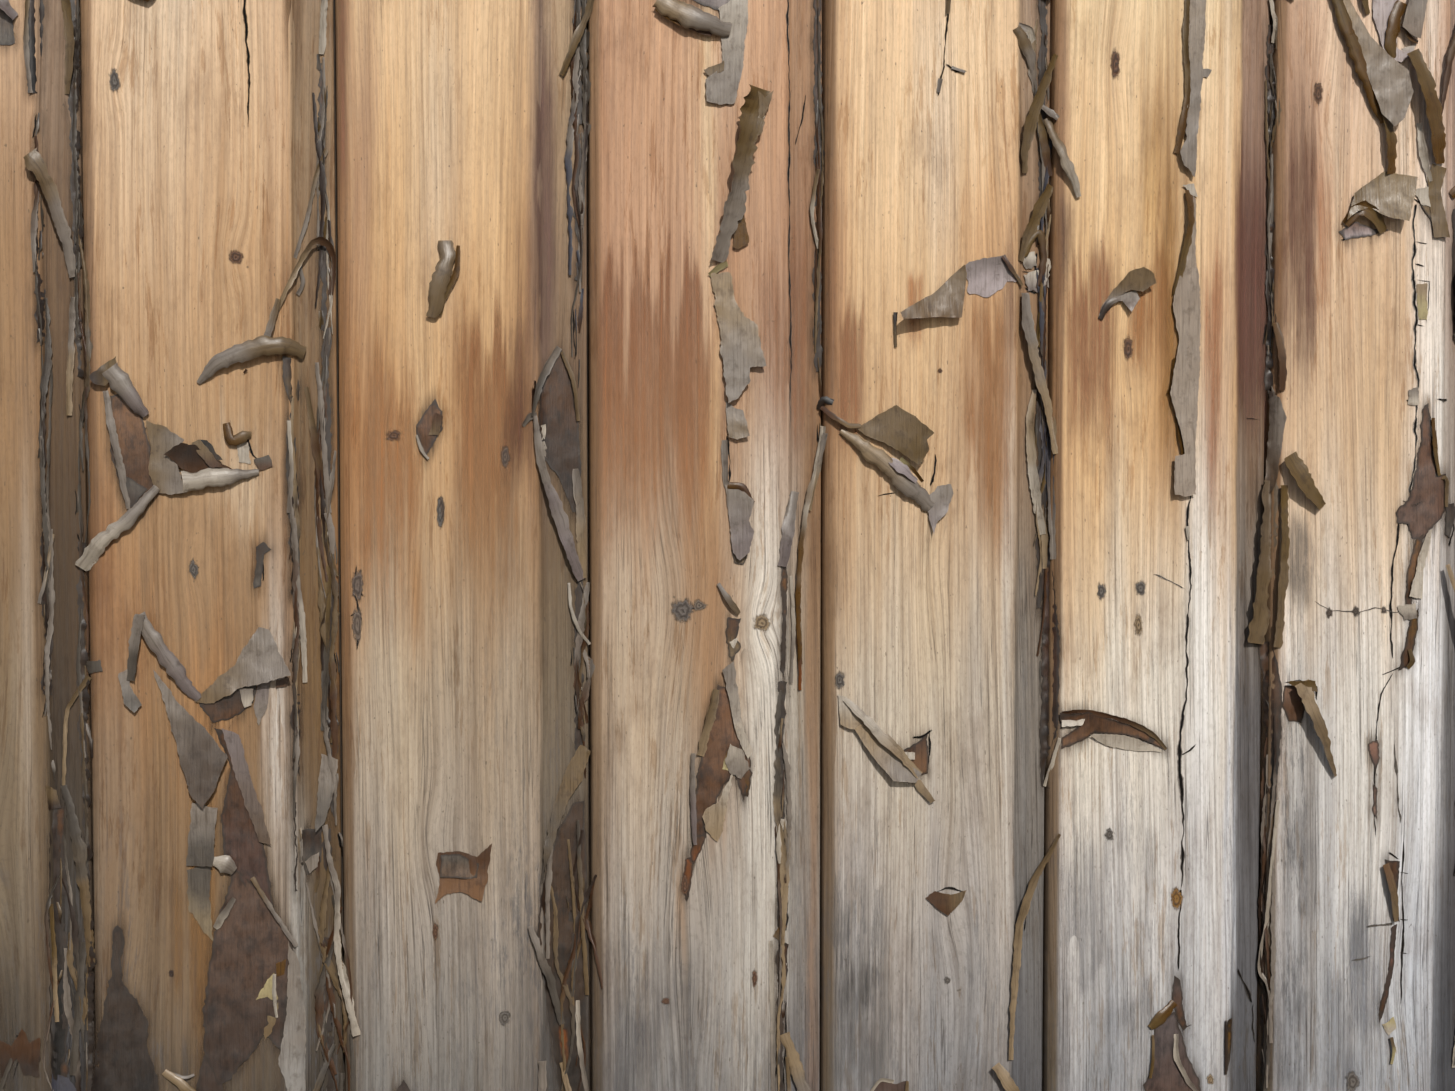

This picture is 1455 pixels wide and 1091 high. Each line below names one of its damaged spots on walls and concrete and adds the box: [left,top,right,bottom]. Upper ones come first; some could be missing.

peeling [0,0,75,94]
peeling [0,148,360,1091]
crack [242,0,251,121]
peeling [652,0,774,565]
peeling [683,583,753,901]
peeling [777,396,954,690]
peeling [893,22,1167,787]
crack [1154,495,1196,969]
peeling [1167,0,1212,497]
peeling [1332,0,1455,337]
peeling [1382,404,1455,675]
peeling [1143,976,1201,1091]